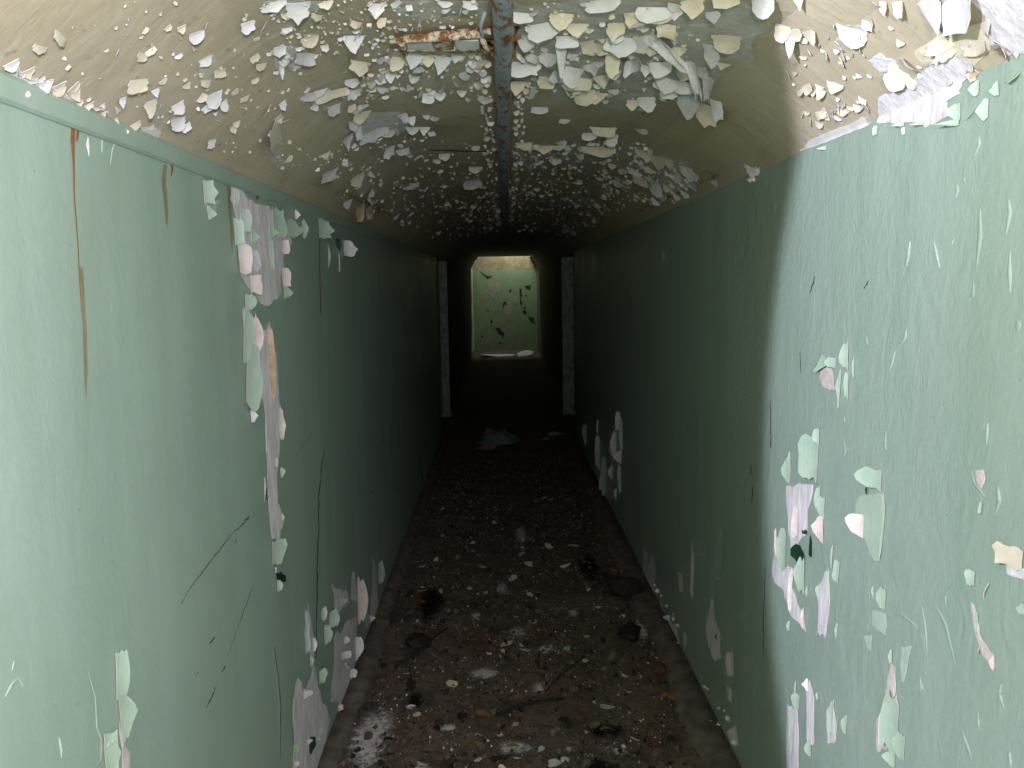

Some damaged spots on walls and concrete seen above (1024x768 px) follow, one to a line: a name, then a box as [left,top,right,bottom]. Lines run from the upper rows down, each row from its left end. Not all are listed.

peeling [2,0,1024,242]
rust [162,165,173,223]
rust [71,128,87,385]
peeling [203,180,358,592]
crack [181,516,249,603]
peeling [772,429,840,639]
peeling [845,466,885,562]
peeling [992,541,1024,579]
peeling [88,650,138,768]
flaking render [292,556,385,768]
peeling [786,678,847,768]
peeling [876,646,912,767]